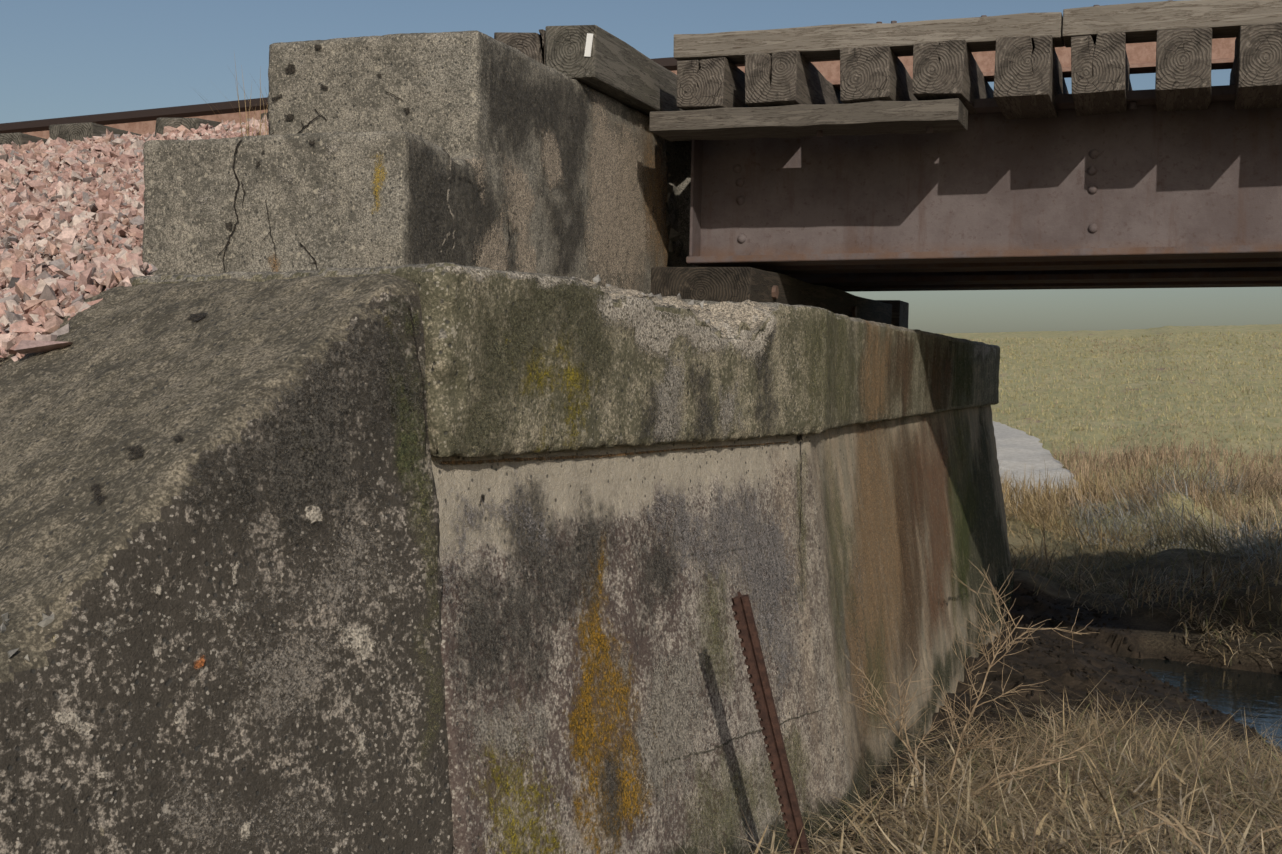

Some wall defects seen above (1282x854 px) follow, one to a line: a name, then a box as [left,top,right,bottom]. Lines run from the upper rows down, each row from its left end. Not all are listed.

crack [218,109,346,273]
water stain [408,39,590,287]
water stain [443,481,662,854]
water stain [636,486,804,698]
water stain [802,406,1014,853]
water stain [715,822,792,854]